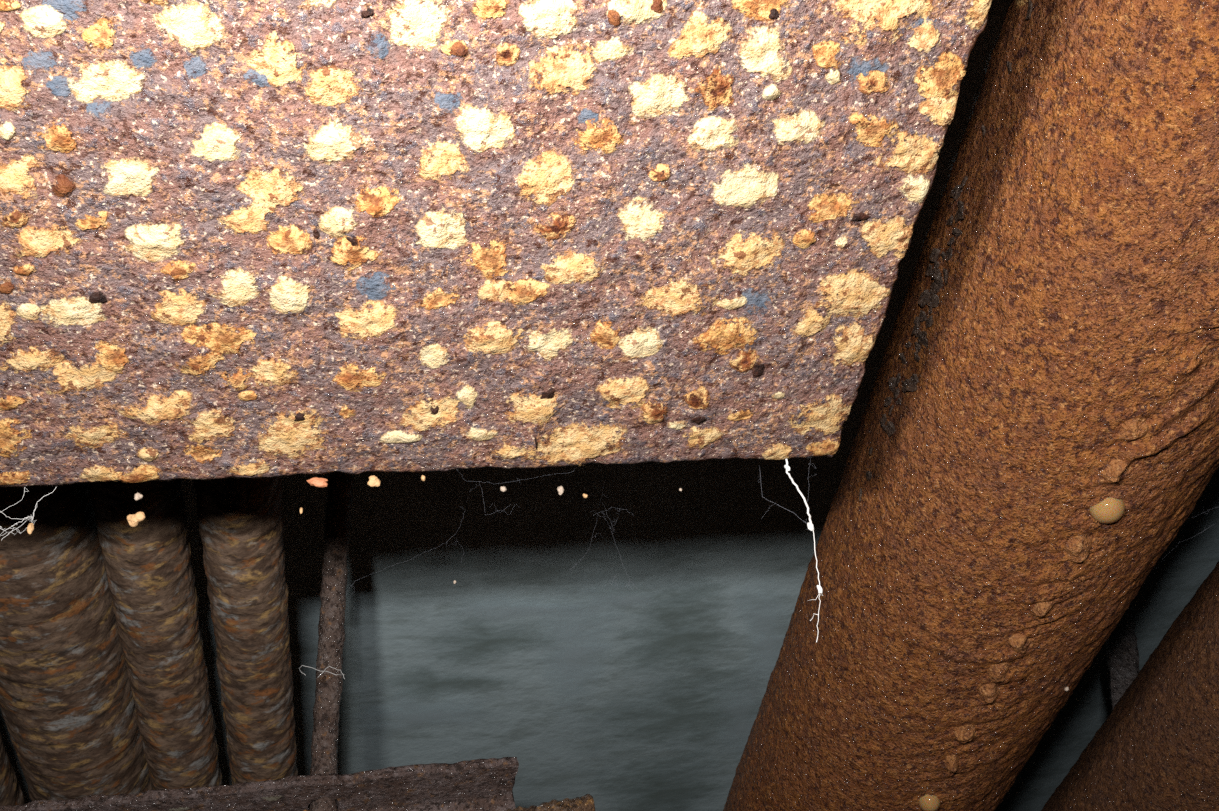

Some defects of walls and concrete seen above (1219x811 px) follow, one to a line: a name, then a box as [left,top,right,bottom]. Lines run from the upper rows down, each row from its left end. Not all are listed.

rust [472,0,634,97]
rust [628,0,792,152]
rust [812,0,992,203]
rust [217,166,401,275]
rust [415,151,603,305]
spalling [851,212,869,221]
rust [0,296,129,395]
spalling [89,291,107,303]
rust [125,222,311,401]
spalling [540,388,555,399]
rust [466,392,629,466]
spalling [753,362,764,377]